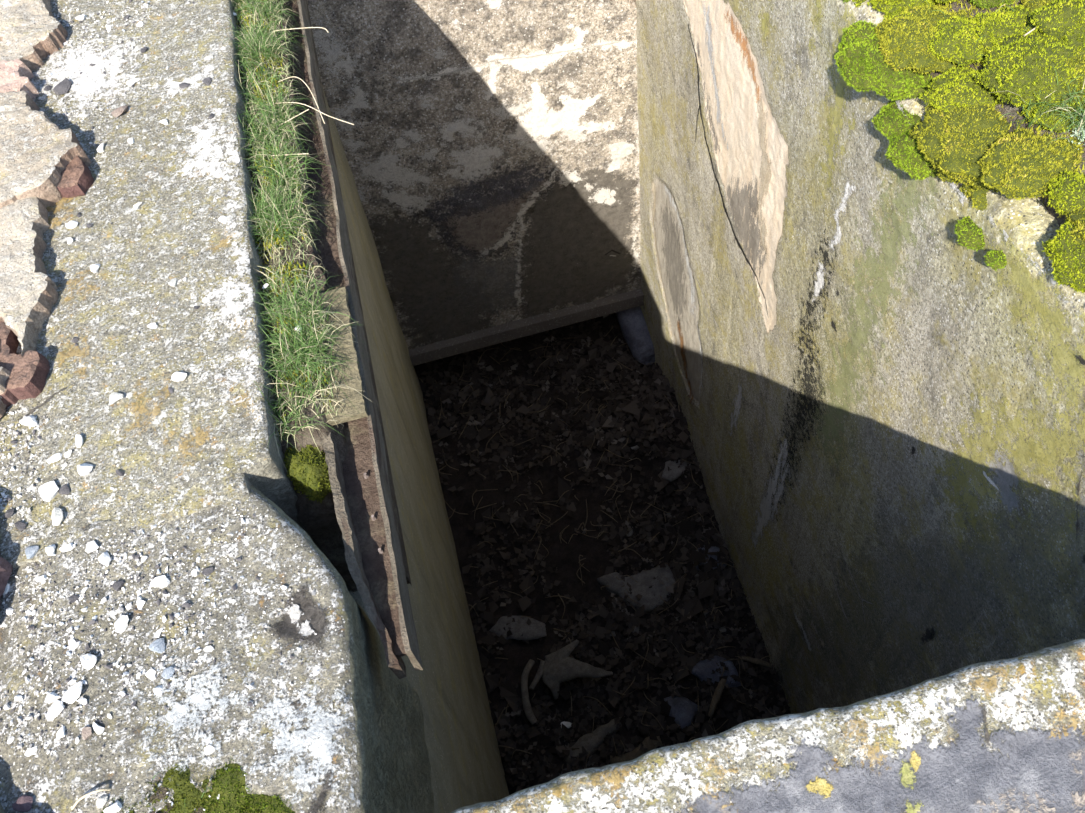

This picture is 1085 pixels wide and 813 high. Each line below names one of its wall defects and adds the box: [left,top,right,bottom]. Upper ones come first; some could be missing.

damp [324,21,637,110]
damp [365,105,641,349]
spalling [683,0,789,333]
damp [750,182,856,548]